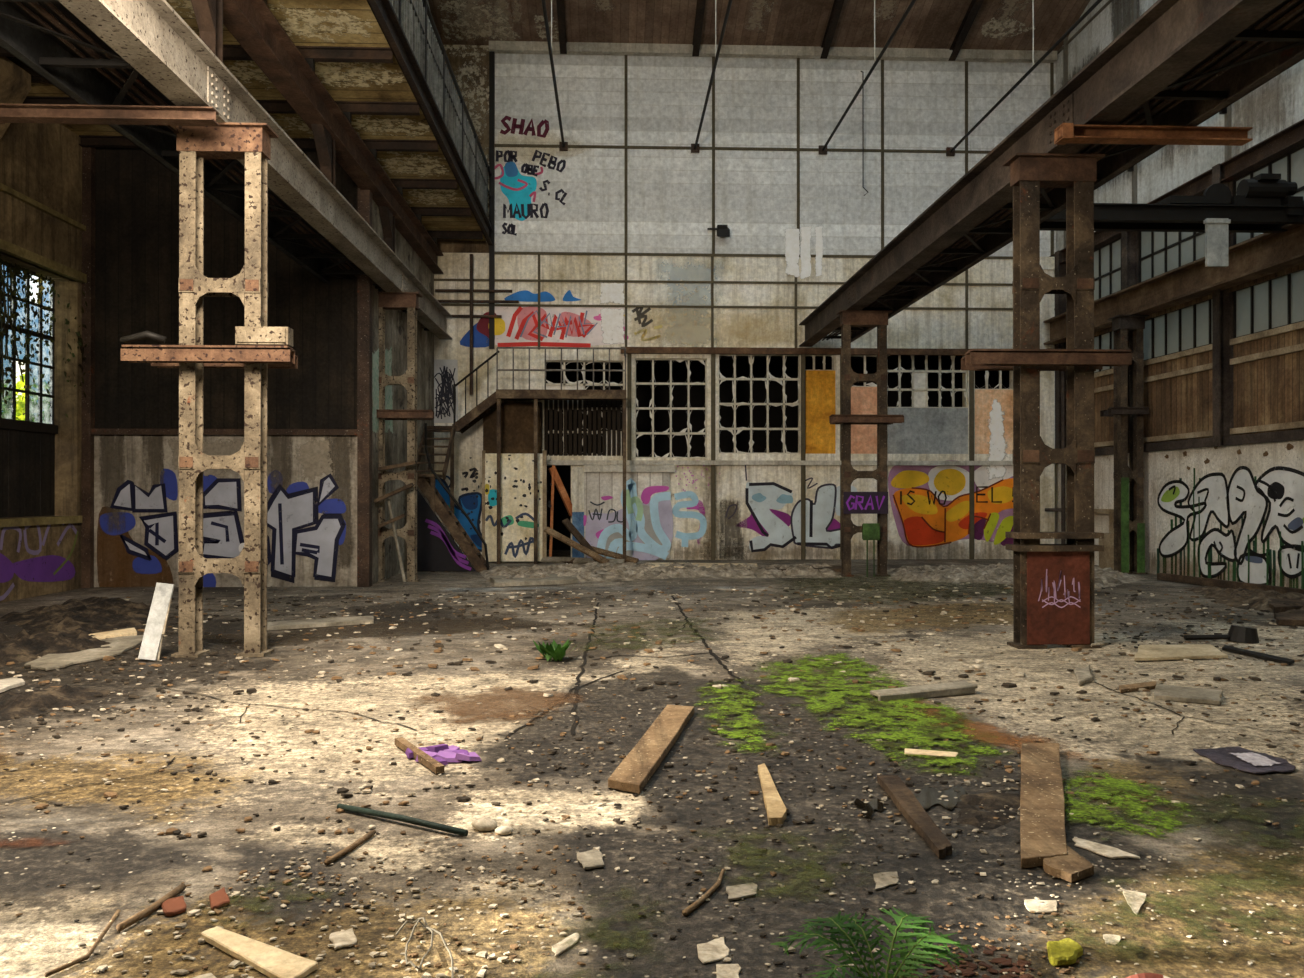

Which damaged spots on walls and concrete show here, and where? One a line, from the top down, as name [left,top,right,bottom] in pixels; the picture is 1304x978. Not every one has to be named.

crack [505,596,744,739]